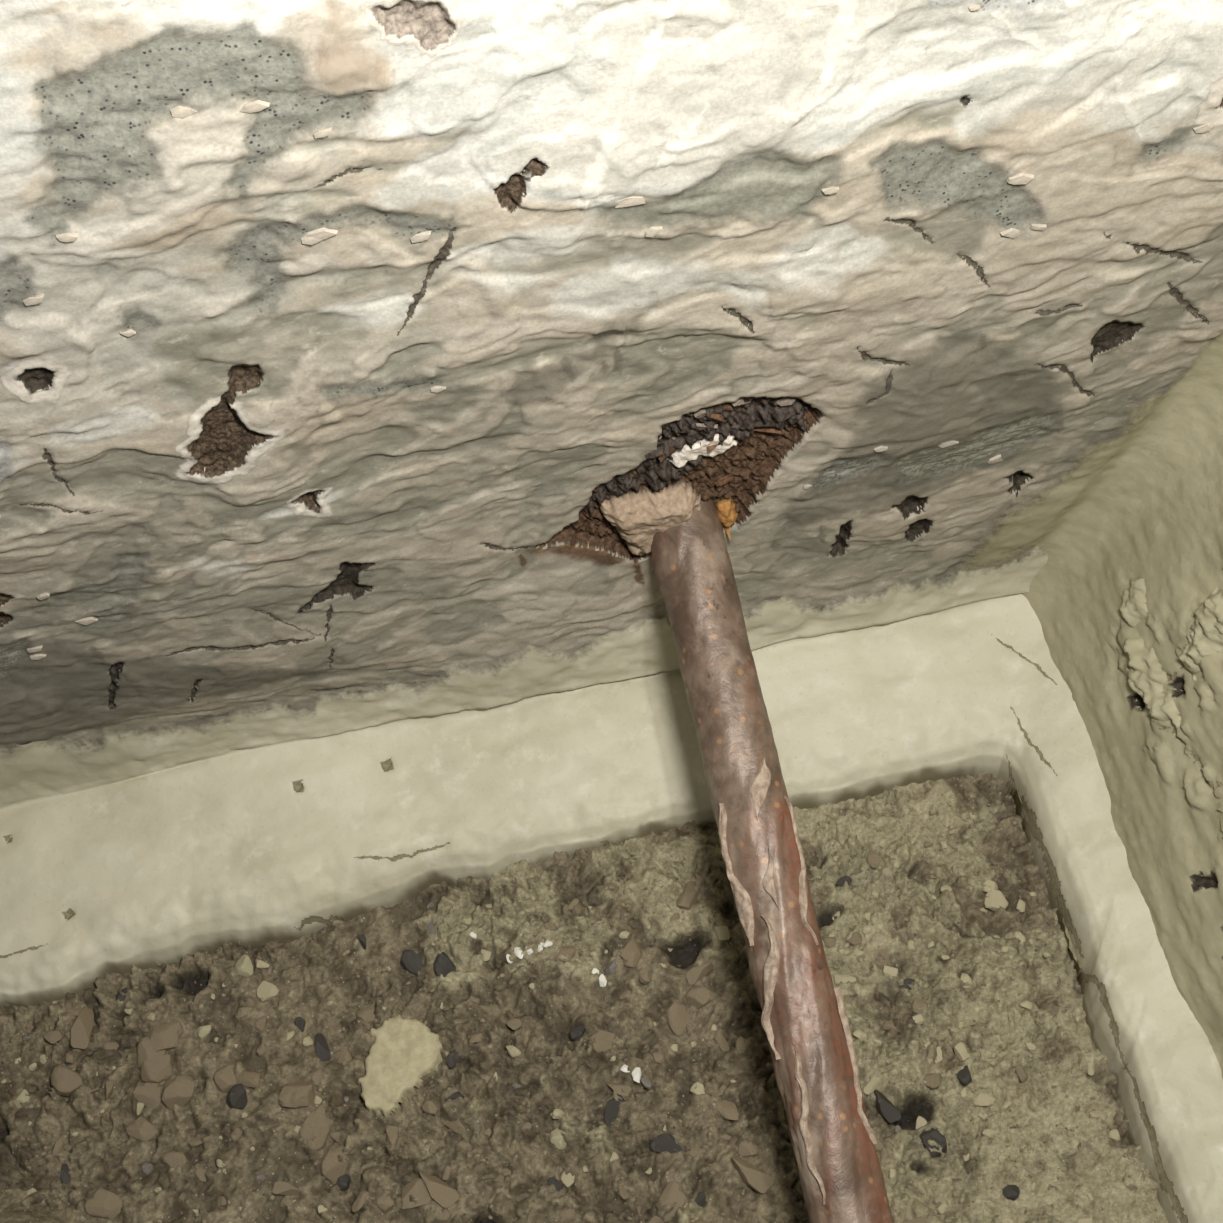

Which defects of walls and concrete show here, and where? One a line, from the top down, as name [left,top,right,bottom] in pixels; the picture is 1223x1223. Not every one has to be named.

spalling [361,0,464,57]
spalling [1142,78,1223,161]
spalling [494,158,549,213]
crack [397,228,456,336]
spalling [1091,320,1145,363]
spalling [0,358,73,403]
spalling [175,364,287,484]
spalling [536,396,823,563]
spalling [298,562,376,613]